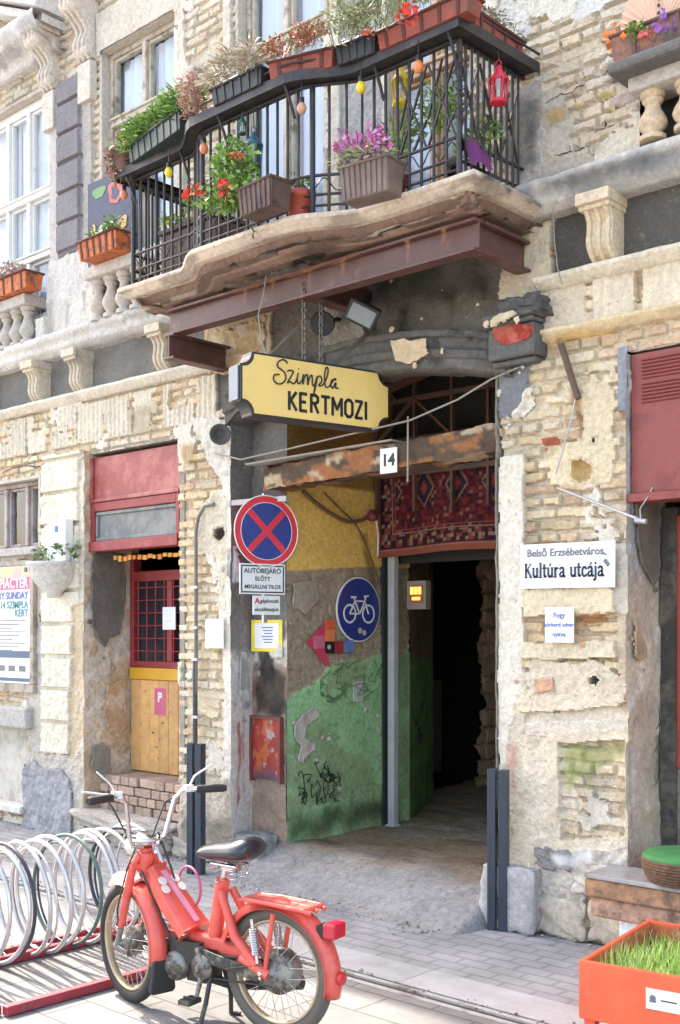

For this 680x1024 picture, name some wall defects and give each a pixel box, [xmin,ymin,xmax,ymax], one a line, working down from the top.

crack [545,71,607,105]
crack [558,121,614,156]
peeling [483,310,535,345]
spalling [389,326,443,369]
peeling [504,385,536,430]
flaking render [541,437,560,451]
spalling [567,456,594,486]
spalling [212,525,227,544]